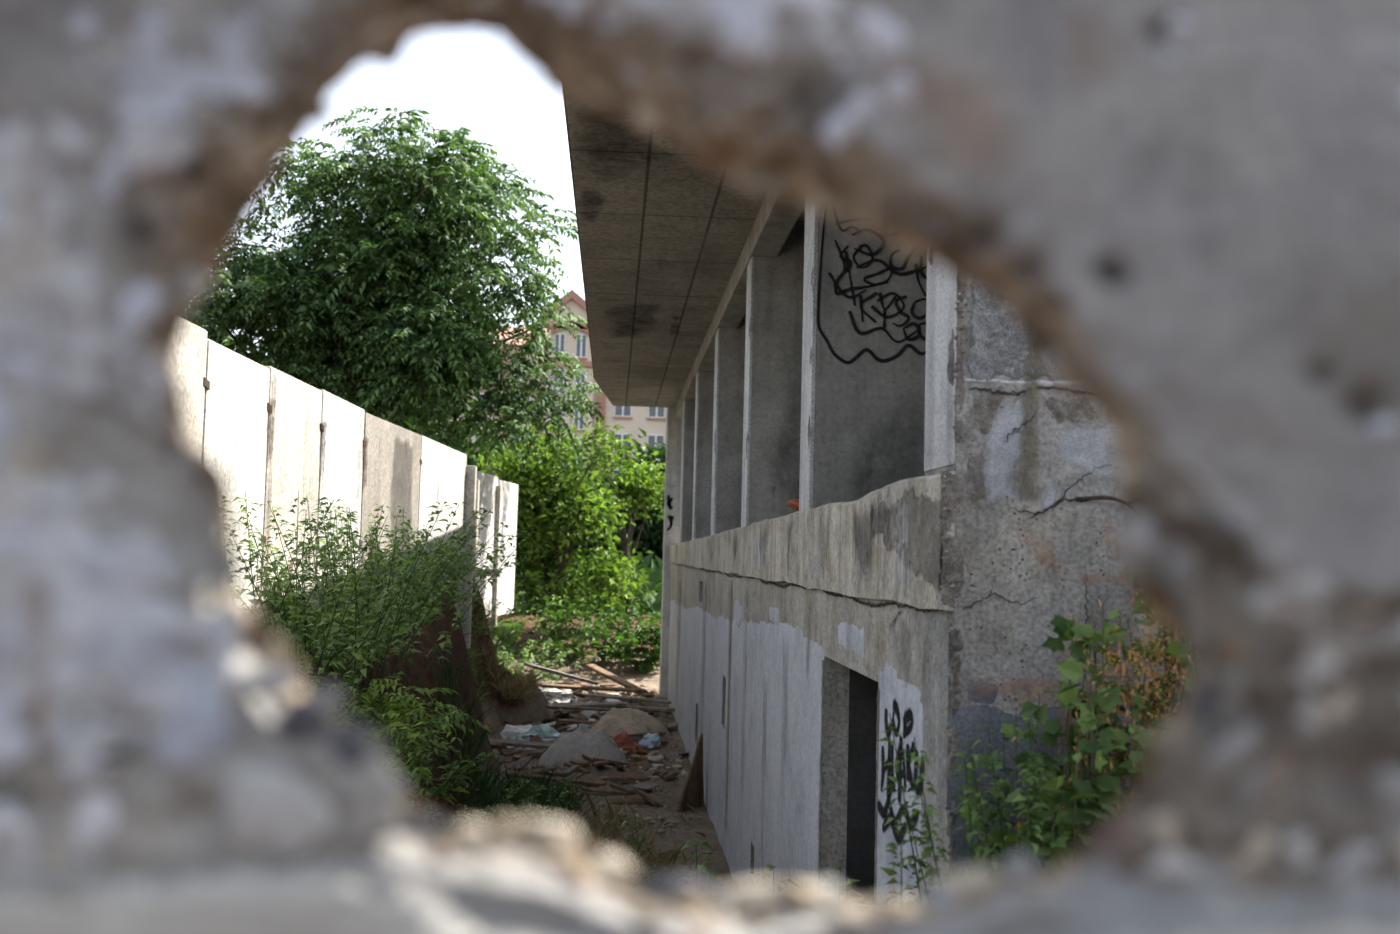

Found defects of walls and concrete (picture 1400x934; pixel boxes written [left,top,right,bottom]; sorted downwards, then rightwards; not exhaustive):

spalling [436,0,502,32]
peeling [558,0,904,135]
spalling [682,73,915,227]
spalling [1096,259,1128,286]
spalling [0,5,493,881]
crack [1003,465,1118,521]
peeling [523,277,1123,934]